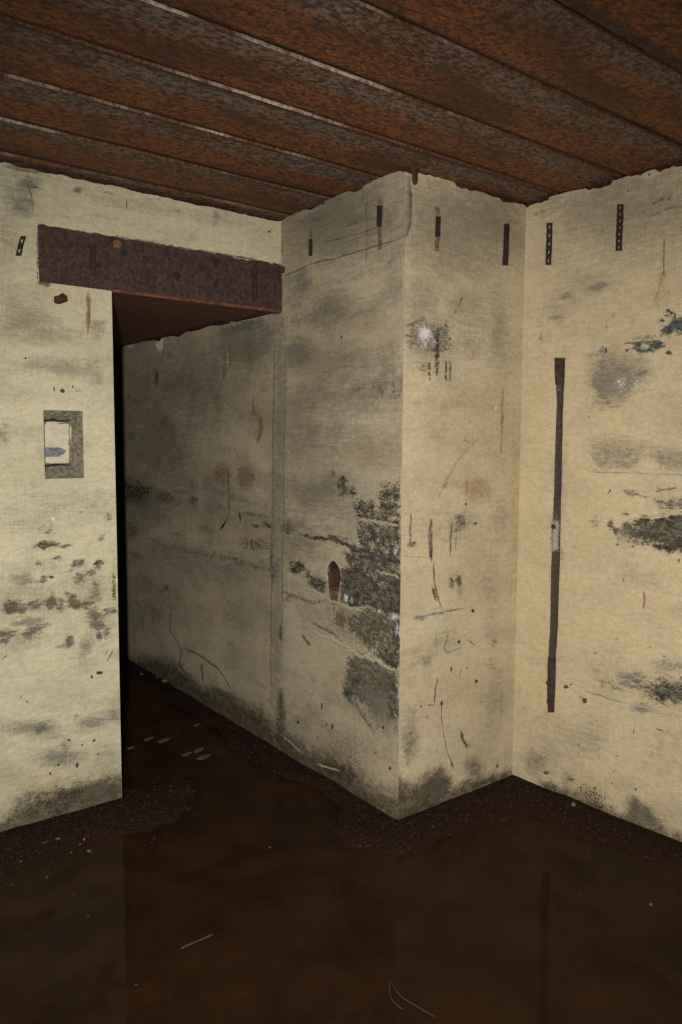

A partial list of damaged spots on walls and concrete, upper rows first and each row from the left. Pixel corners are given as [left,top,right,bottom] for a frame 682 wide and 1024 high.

rust [409,167,421,185]
water stain [404,318,465,380]
water stain [37,516,70,559]
water stain [607,488,682,562]
water stain [0,559,118,655]
crack [169,611,231,689]
water stain [125,471,508,820]
water stain [600,672,682,712]
water stain [543,784,680,840]